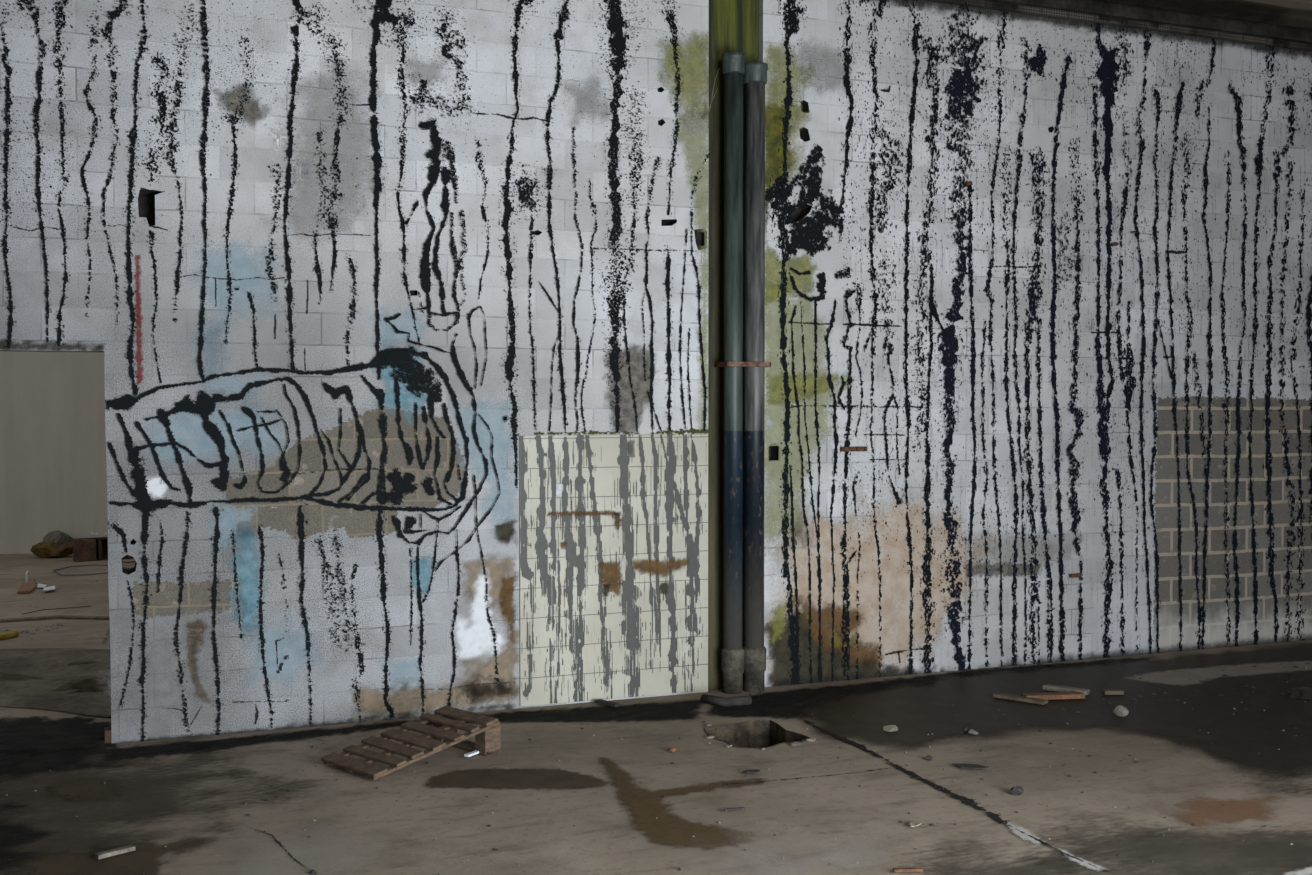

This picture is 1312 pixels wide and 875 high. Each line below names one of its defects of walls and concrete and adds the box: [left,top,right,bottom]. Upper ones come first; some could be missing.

damp [221,86,263,124]
spalling [138,190,161,227]
damp [381,353,427,417]
damp [607,346,655,432]
damp [496,521,514,543]
rust [548,511,622,529]
damp [232,531,260,634]
damp [412,557,432,593]
rust [599,559,689,596]
rust [768,503,969,678]
peeling [455,558,519,704]
damp [764,615,1312,777]